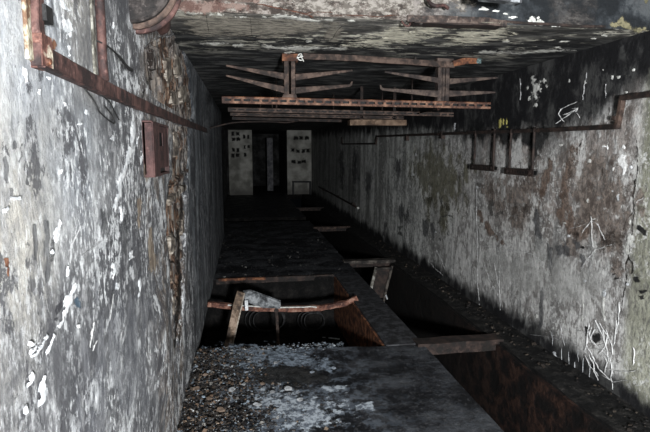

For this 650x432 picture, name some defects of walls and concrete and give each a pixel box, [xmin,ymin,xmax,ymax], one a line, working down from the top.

water stain [179,12,348,45]
peeling [526,76,548,107]
spalling [144,37,192,337]
corrosion [481,158,553,231]
corrosion [477,210,504,245]
crack [614,140,638,346]
peeling [27,371,48,407]